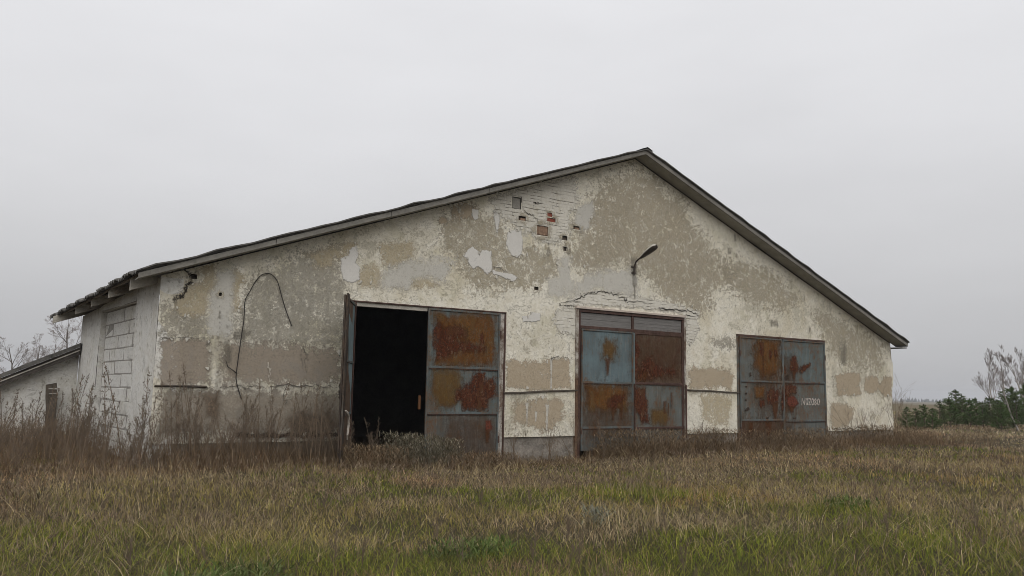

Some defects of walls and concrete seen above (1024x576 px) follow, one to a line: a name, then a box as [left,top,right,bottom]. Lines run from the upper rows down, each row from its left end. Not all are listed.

crack [173,266,193,303]
peeling [437,162,736,346]
corrosion [433,312,498,443]
corrosion [586,338,679,426]
corrosion [744,337,811,439]